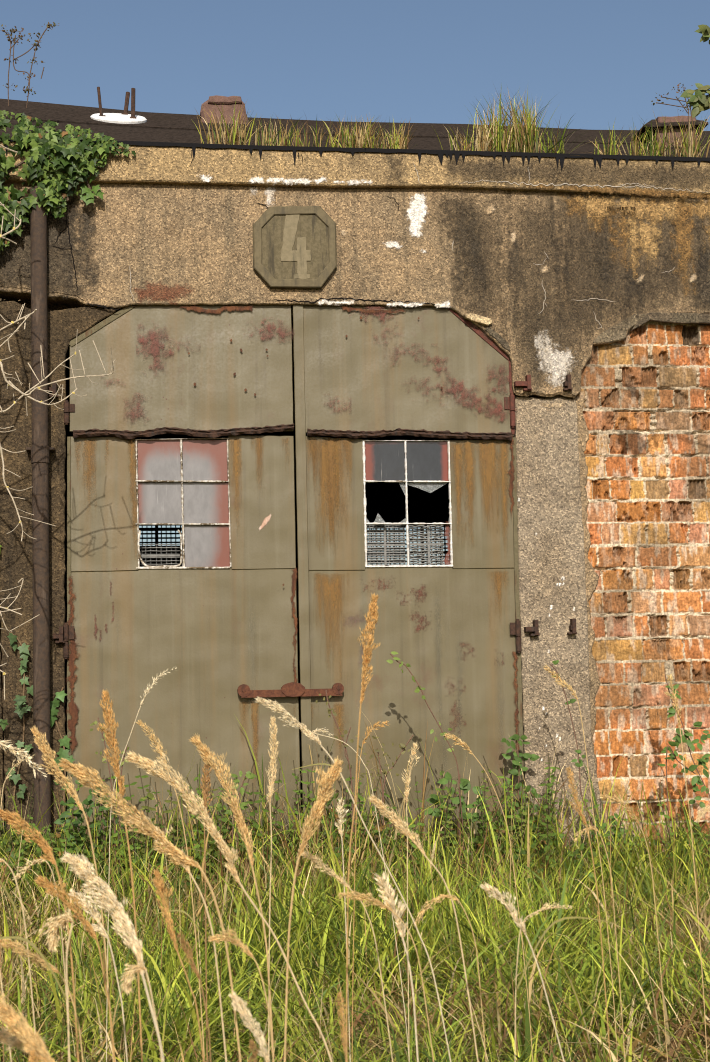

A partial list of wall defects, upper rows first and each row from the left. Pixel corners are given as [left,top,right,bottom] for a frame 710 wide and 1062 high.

water stain [445,157,710,387]
spalling [682,324,700,346]
spalling [583,314,669,455]
rust [73,423,294,528]
rust [307,428,515,528]
spalling [591,479,694,523]
spalling [595,546,637,569]
spalling [671,568,691,590]
spalling [642,638,684,661]